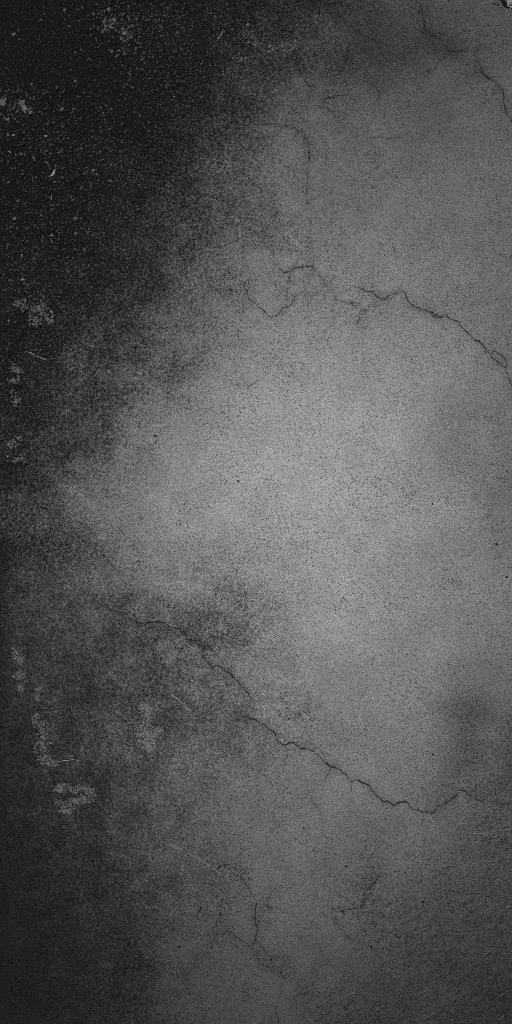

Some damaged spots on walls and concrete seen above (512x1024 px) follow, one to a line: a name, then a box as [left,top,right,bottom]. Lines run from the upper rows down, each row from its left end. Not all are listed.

crack [207,233,512,387]
crack [102,600,492,816]